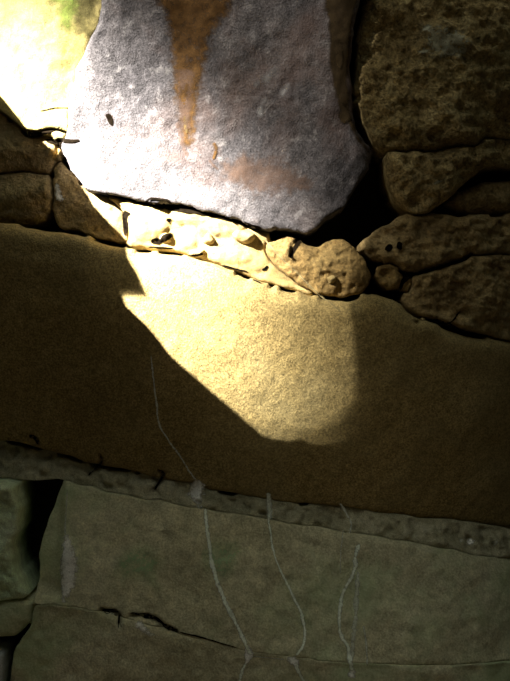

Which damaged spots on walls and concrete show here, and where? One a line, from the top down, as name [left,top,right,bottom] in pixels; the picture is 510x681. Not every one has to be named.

corrosion [159,0,231,150]
crack [102,607,236,648]